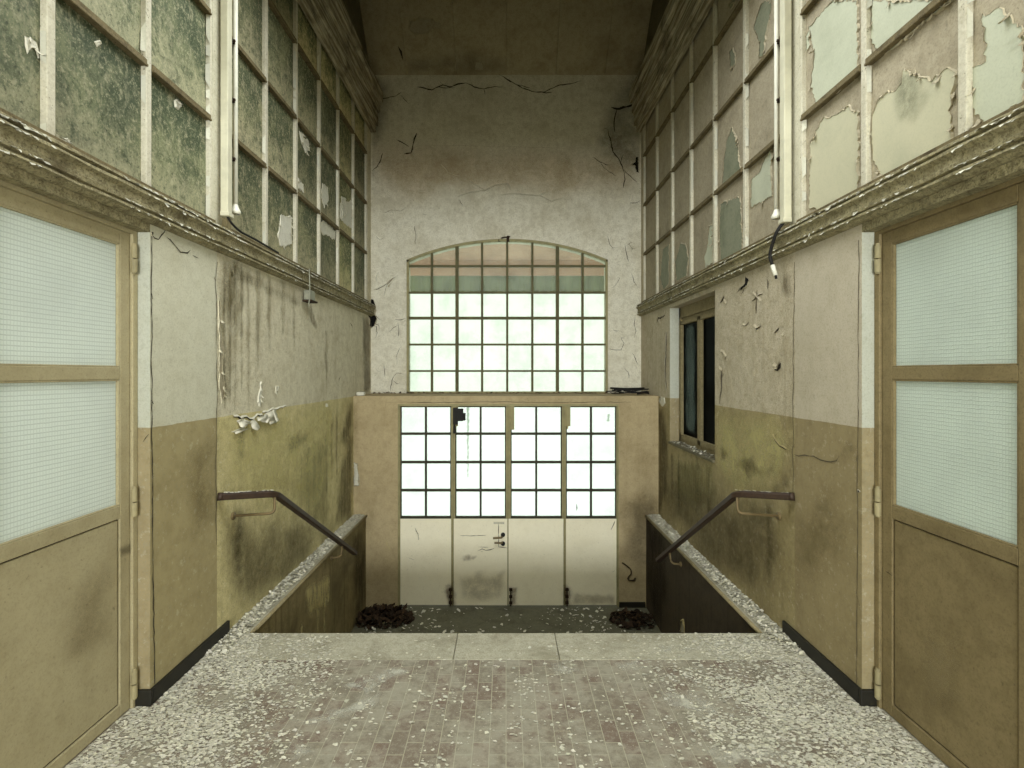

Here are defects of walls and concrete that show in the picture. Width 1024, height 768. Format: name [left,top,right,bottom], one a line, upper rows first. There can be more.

crack [383,76,578,103]
peeling [806,0,1024,210]
peeling [299,131,311,156]
crack [372,133,417,171]
crack [595,104,637,203]
peeling [722,127,741,184]
peeling [277,214,295,249]
peeling [321,183,353,240]
peeling [704,150,773,268]
peeling [232,382,286,434]